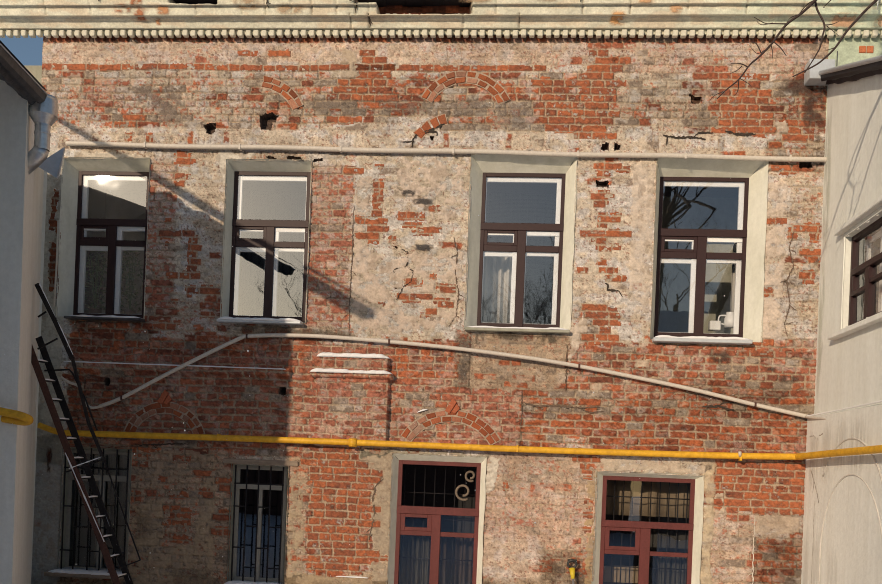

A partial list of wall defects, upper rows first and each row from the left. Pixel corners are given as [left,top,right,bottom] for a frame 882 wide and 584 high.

peeling [215,150,256,183]
spalling [52,48,631,151]
crack [404,124,444,147]
crack [663,131,755,144]
spalling [692,72,815,143]
peeling [343,157,465,336]
crack [394,249,414,300]
crack [449,238,463,326]
peeling [577,162,656,314]
crack [780,232,796,336]
spalling [567,304,623,362]
spalling [284,446,509,584]